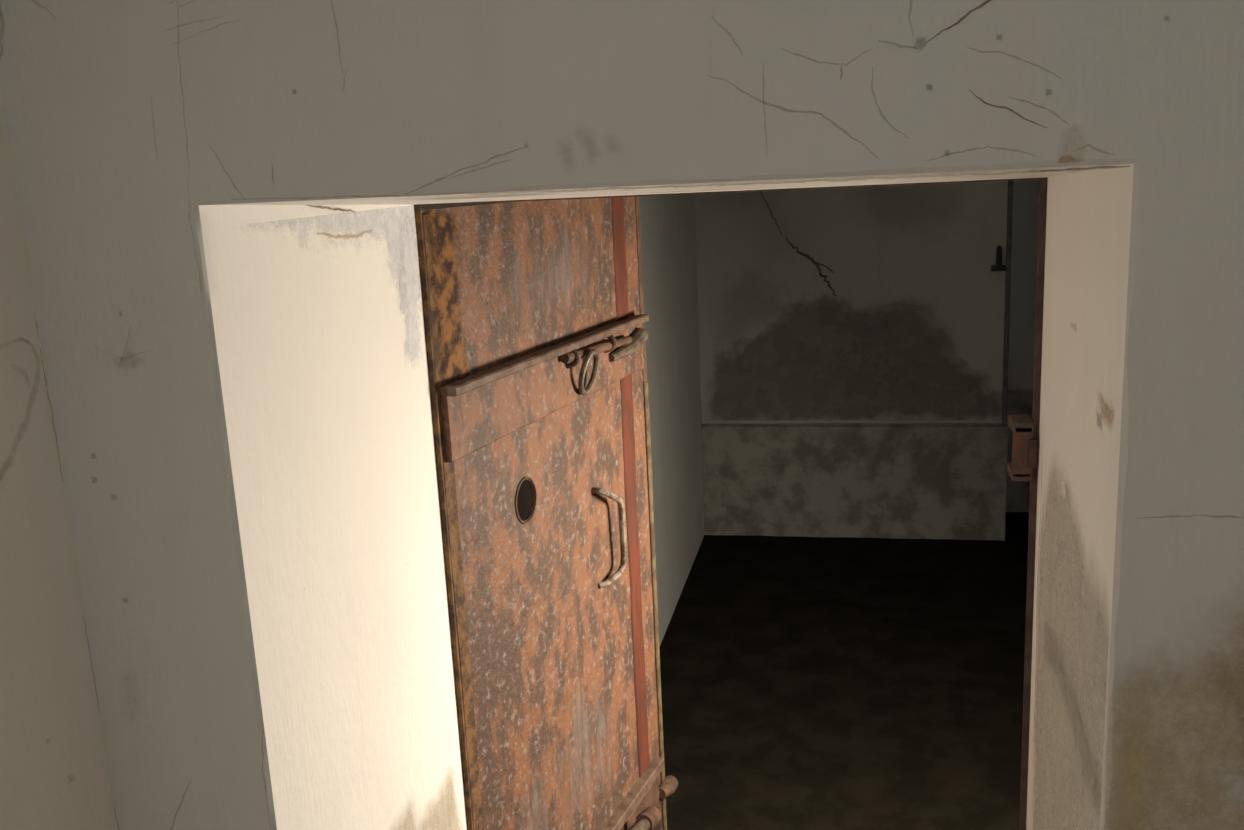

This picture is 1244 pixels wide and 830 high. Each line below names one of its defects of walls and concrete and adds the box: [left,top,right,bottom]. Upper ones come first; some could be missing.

crack [925,0,991,43]
crack [968,89,1048,128]
crack [1023,165,1130,173]
crack [760,191,837,296]